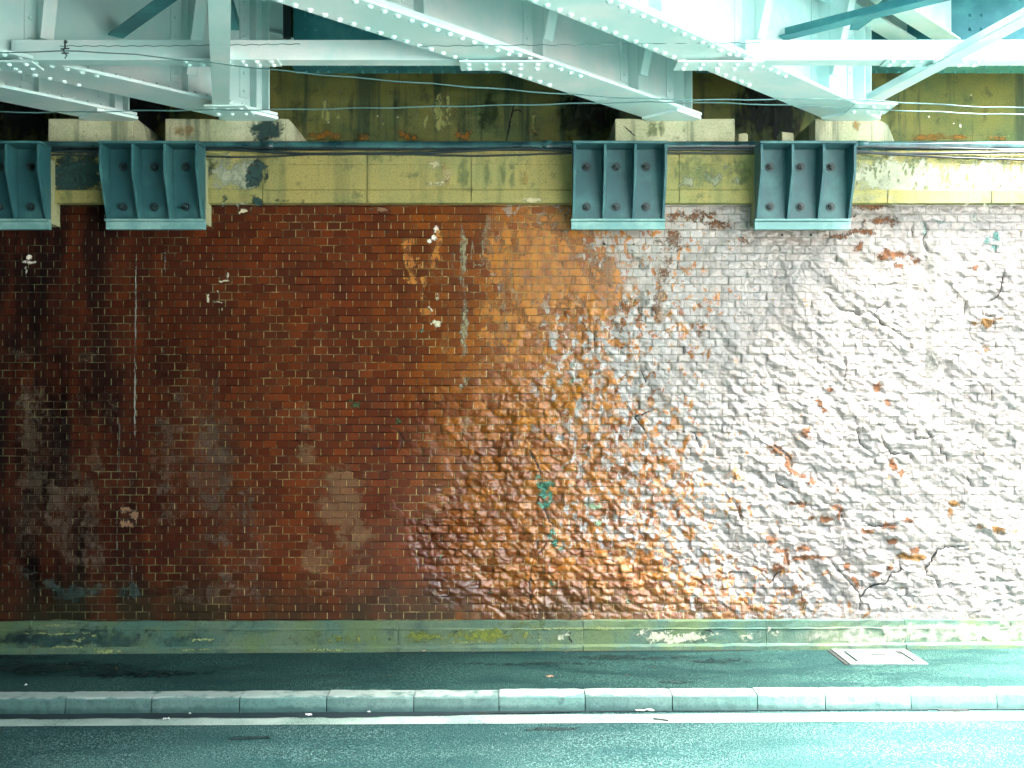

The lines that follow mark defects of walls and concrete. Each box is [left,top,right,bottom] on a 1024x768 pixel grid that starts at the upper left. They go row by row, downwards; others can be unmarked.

spalling [655,209,754,277]
spalling [621,292,660,328]
crack [964,275,1004,323]
water stain [302,464,380,584]
crack [831,546,964,610]